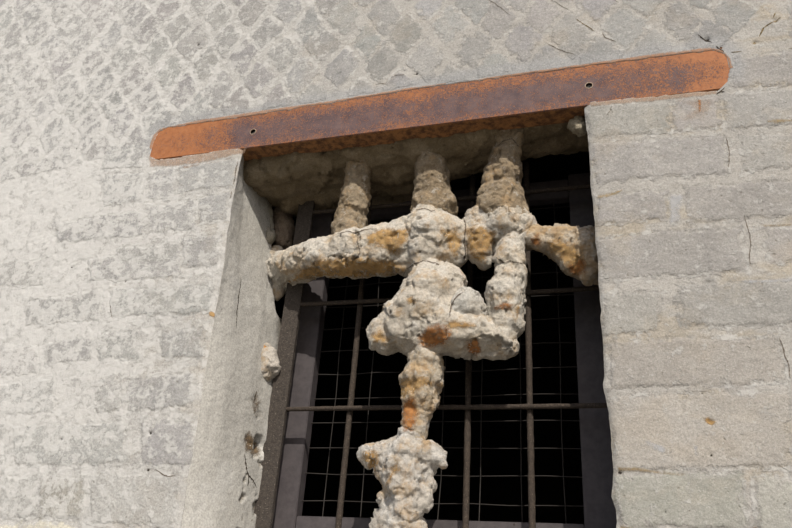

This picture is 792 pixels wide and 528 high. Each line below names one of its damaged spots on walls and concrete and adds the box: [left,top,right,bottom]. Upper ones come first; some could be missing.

corrosion [459,48,733,83]
corrosion [150,83,446,165]
flaking render [244,431,260,456]